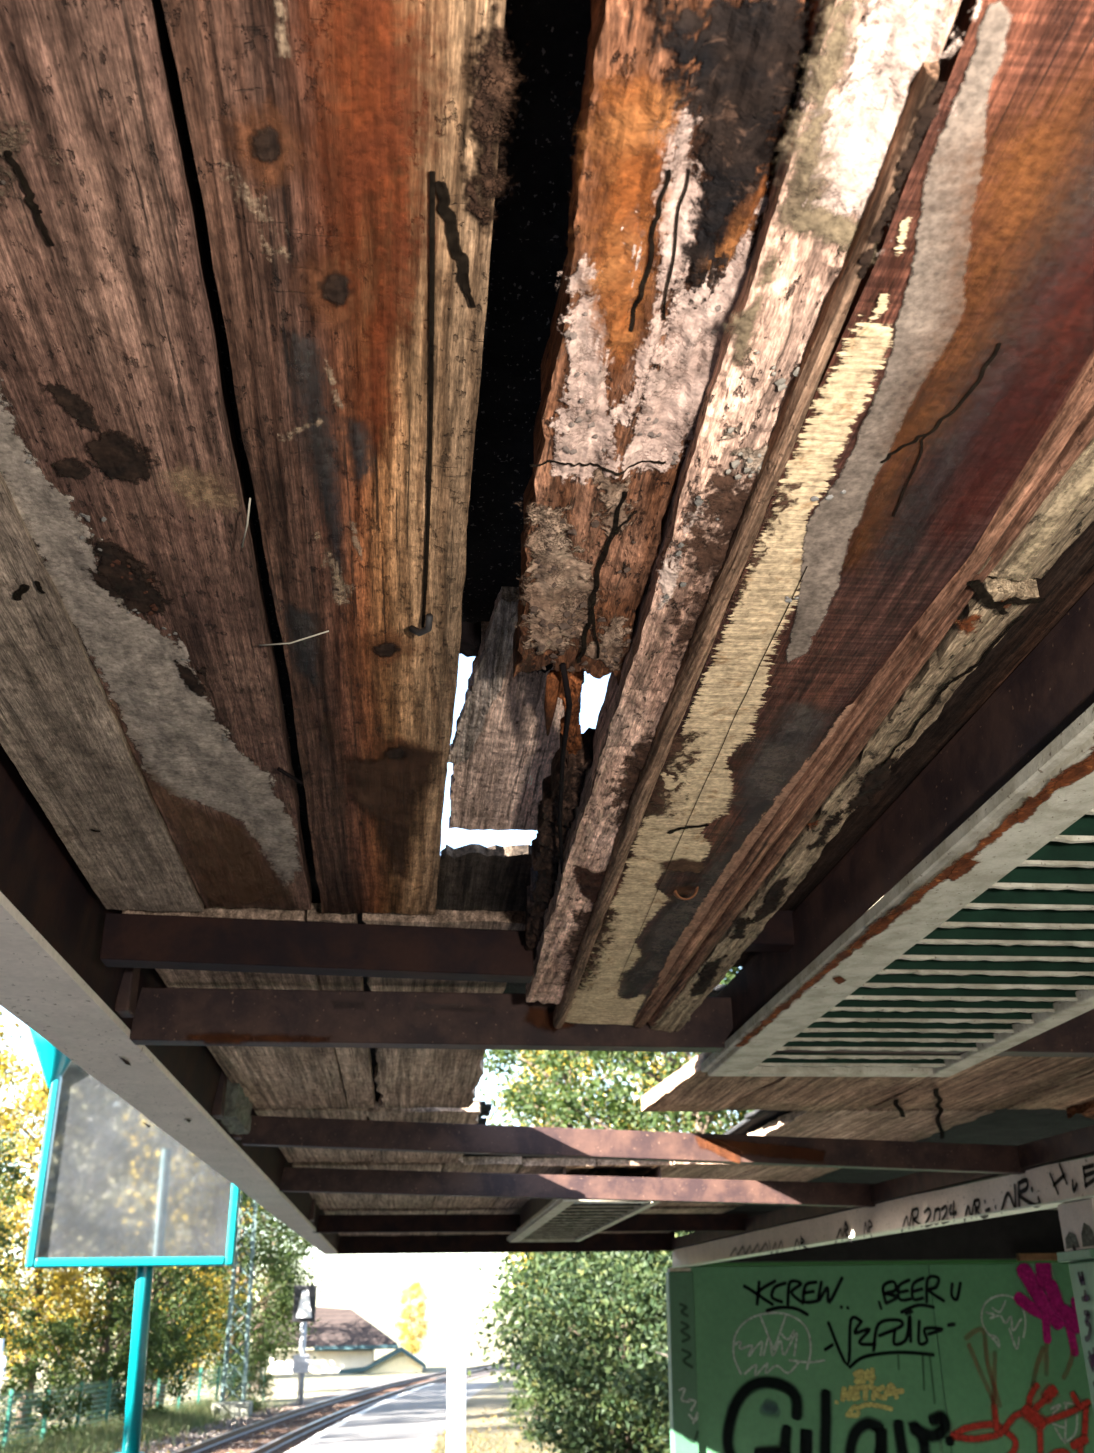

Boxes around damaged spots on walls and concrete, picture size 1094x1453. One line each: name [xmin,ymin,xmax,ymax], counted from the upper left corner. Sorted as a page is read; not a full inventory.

damp [588,78,676,365]
crack [629,169,691,332]
damp [724,250,780,367]
damp [708,0,860,277]
crack [881,343,1001,517]
crack [530,460,666,664]
crack [659,463,802,656]
corrosion [955,614,982,634]
crack [556,566,808,991]
corrosion [736,747,1094,1047]